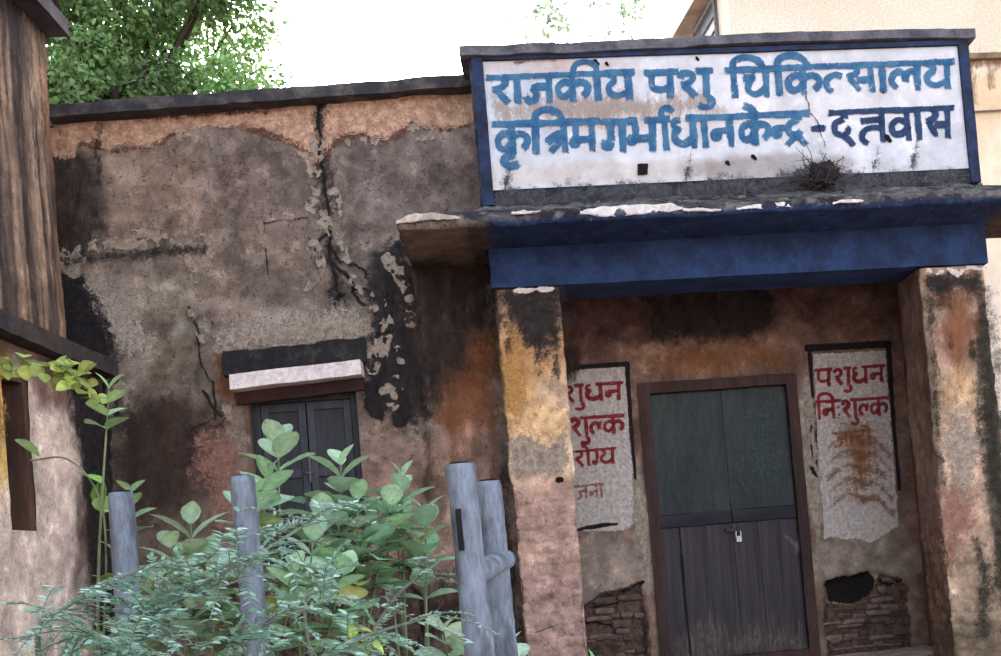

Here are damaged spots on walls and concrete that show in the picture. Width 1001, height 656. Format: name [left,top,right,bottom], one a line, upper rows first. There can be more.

leakage [0,0,119,363]
crack [263,104,370,318]
spalling [396,212,460,224]
crack [188,306,234,433]
leakage [212,237,580,503]
leakage [67,375,224,654]
leakage [416,568,461,646]
leakage [499,469,512,551]
flaking render [584,475,652,656]
rust [826,417,895,516]
flaking render [823,571,912,656]
leakage [972,536,995,642]